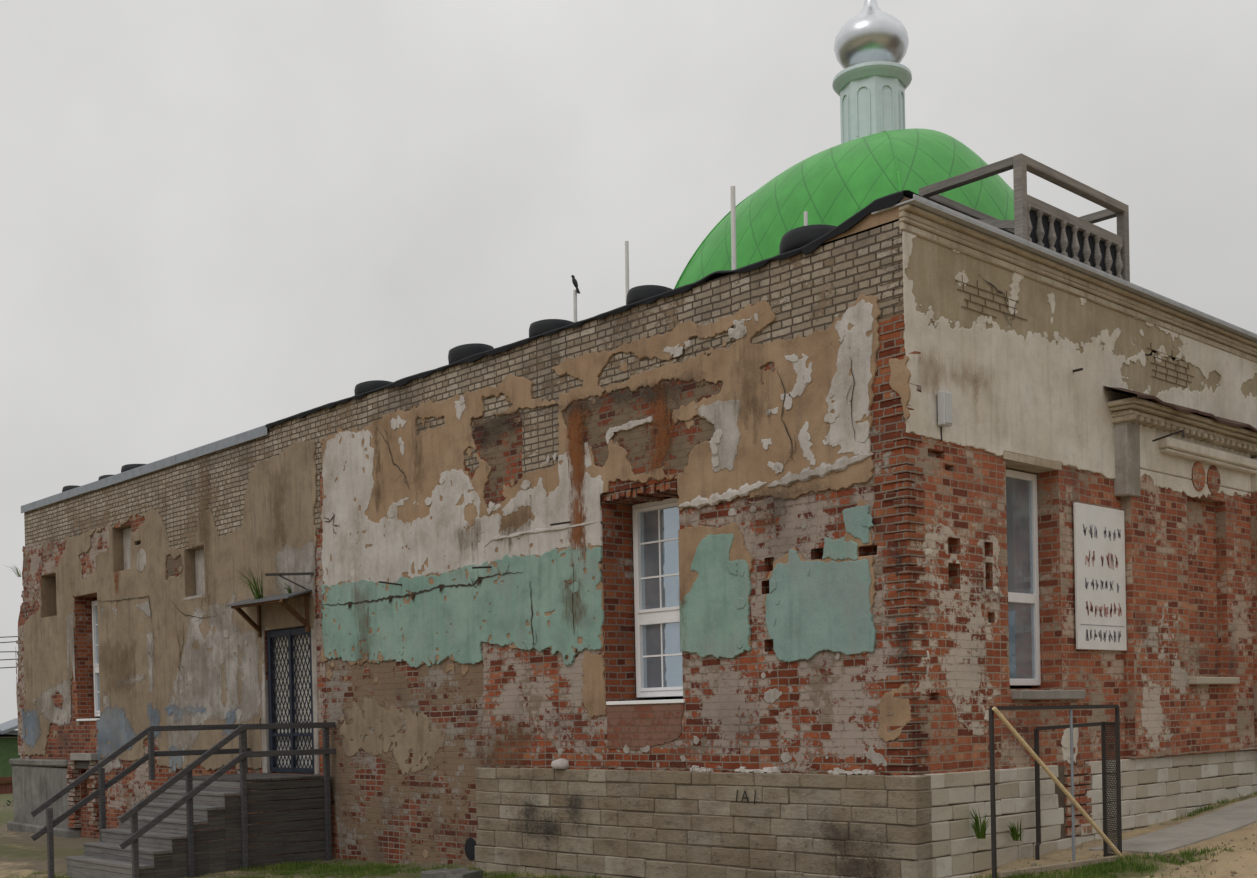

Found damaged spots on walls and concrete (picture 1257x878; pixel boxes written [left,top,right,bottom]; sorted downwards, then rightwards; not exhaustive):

peeling [905,237,1221,396]
crack [777,373,796,465]
peeling [1241,373,1257,399]
spalling [79,514,145,579]
crack [324,572,536,660]
spalling [275,300,1010,866]
peeling [15,539,261,812]
peeling [1136,599,1188,752]
peeling [1061,727,1079,764]